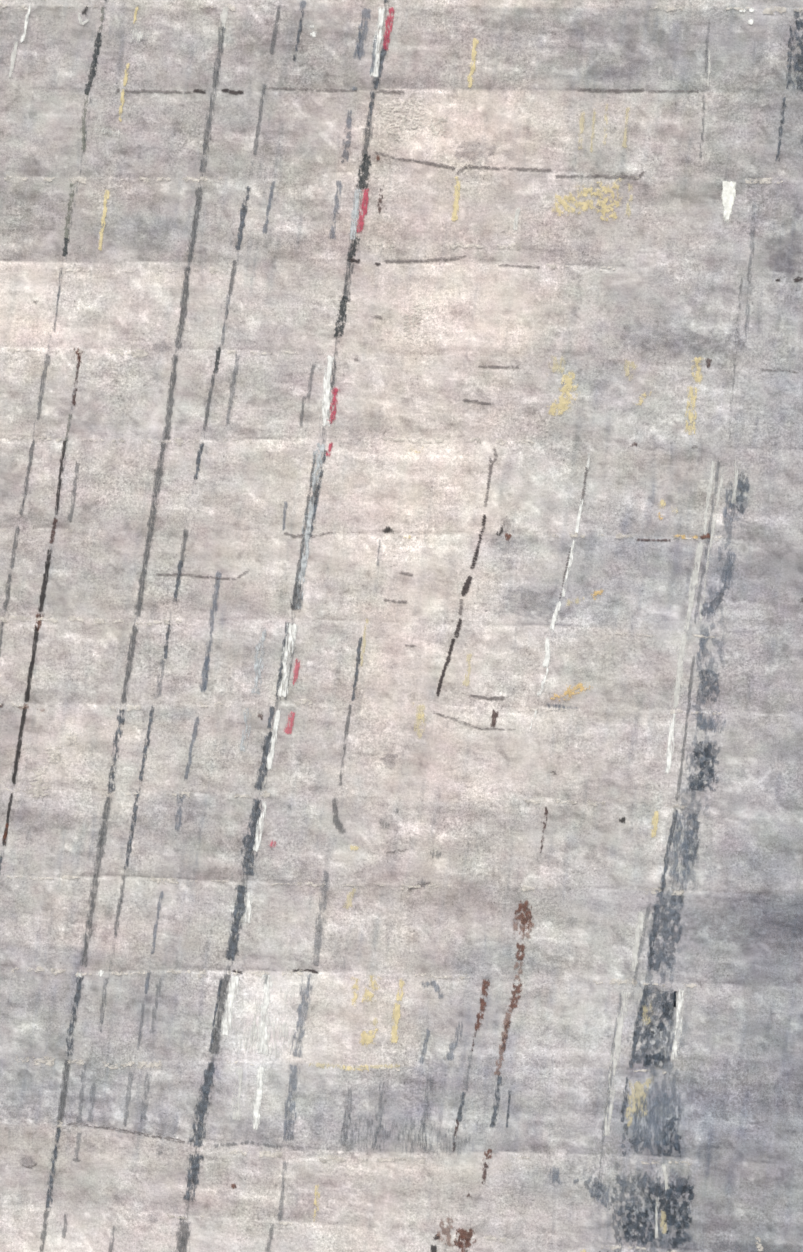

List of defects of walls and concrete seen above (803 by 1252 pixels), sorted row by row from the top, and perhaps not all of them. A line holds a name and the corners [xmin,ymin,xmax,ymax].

corrosion [471,979,490,1051]
corrosion [494,901,534,1075]
corrosion [431,1218,476,1252]